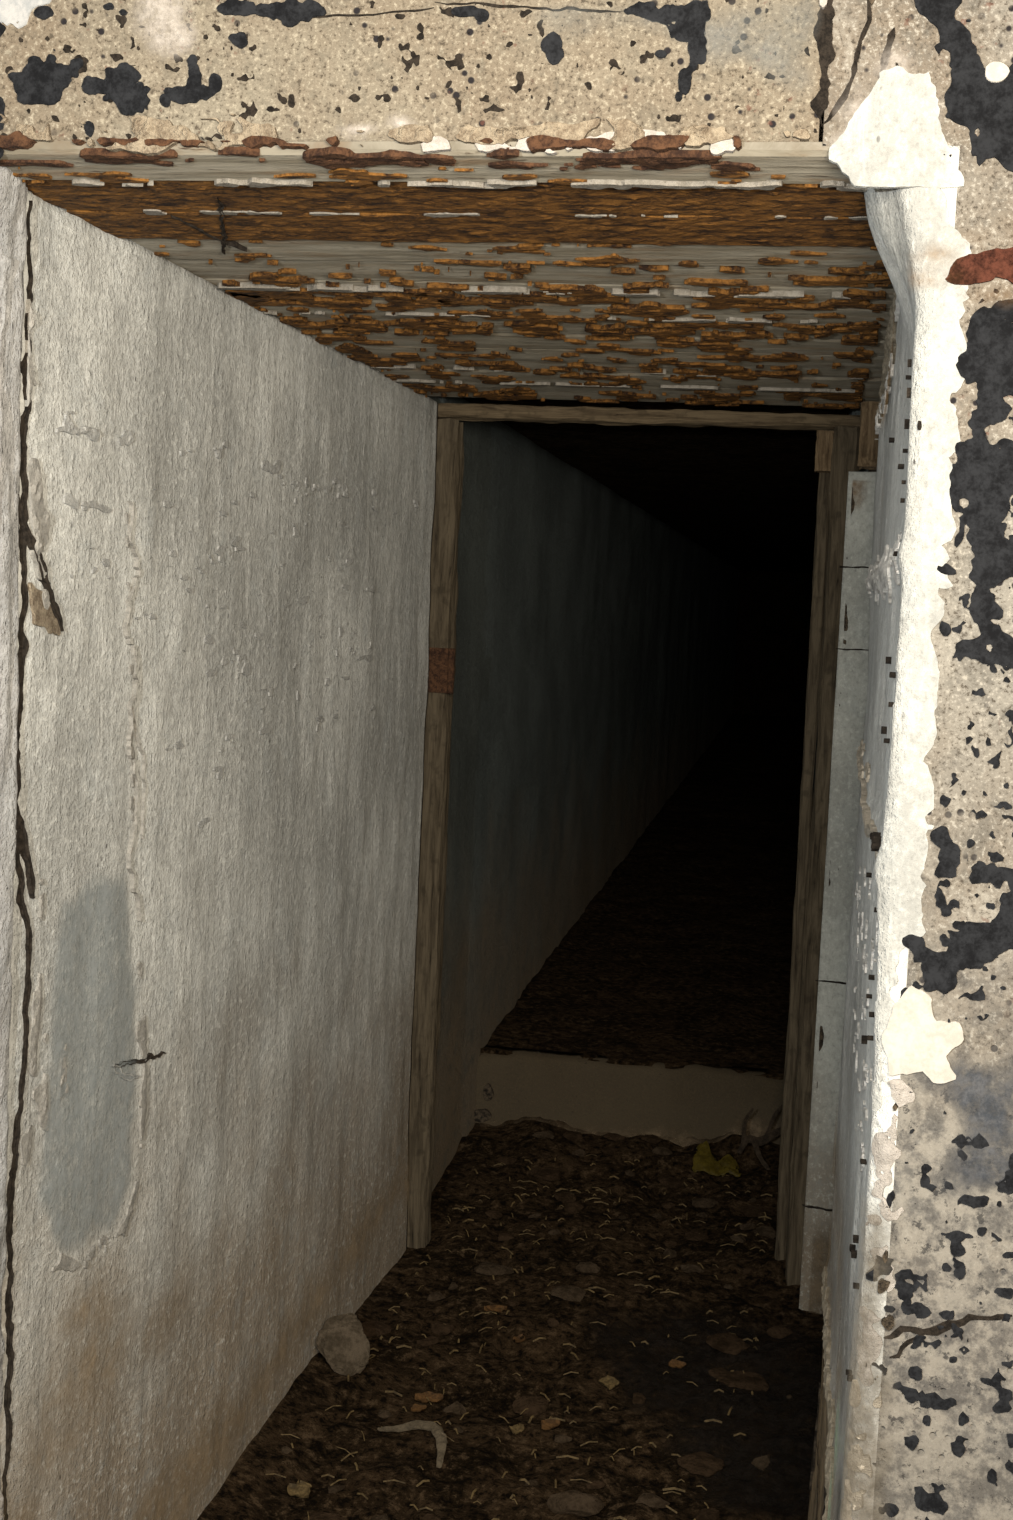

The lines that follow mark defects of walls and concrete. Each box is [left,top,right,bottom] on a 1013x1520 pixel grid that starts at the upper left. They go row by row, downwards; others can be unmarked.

peeling [0,0,340,158]
spalling [335,0,742,154]
corrosion [0,146,892,409]
corrosion [945,247,1013,285]
crack [2,201,64,1520]
crack [122,501,147,921]
crack [856,739,882,860]
peeling [757,0,1013,1458]
leakage [949,1067,1013,1184]
peeling [841,1436,949,1520]
peeling [987,1433,1013,1486]